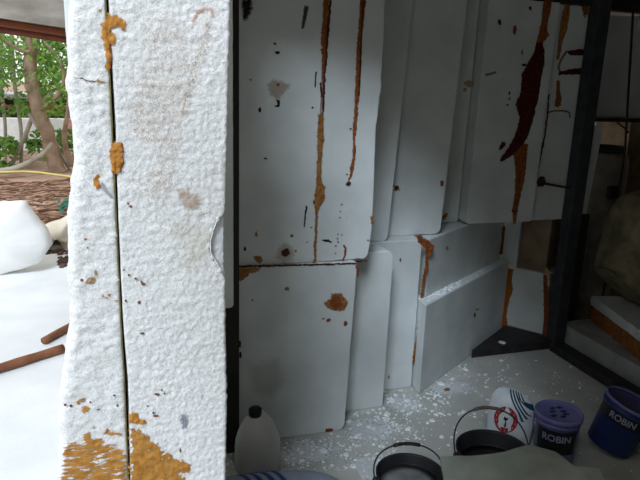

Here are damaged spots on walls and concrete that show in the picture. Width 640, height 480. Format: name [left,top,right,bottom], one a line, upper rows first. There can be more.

corrosion [99,10,126,73]
corrosion [548,4,584,118]
corrosion [109,141,124,174]
corrosion [239,0,367,281]
corrosion [499,0,552,224]
spalling [207,216,226,274]
corrosion [324,293,348,312]
corrosion [417,235,434,298]
corrosion [501,268,513,328]
corrosion [59,412,191,480]